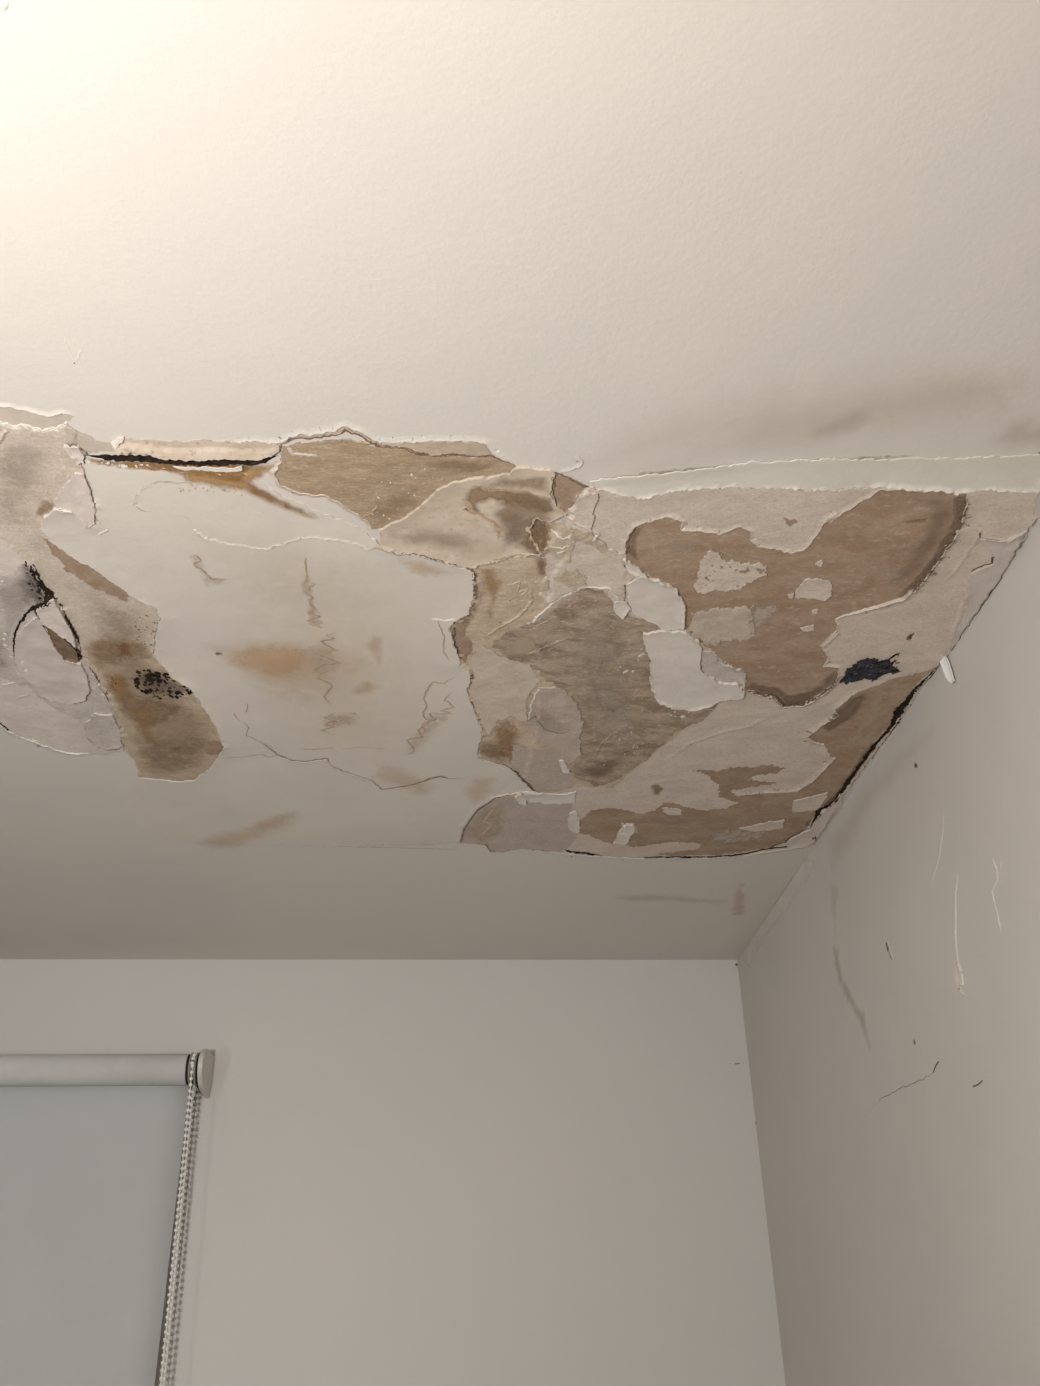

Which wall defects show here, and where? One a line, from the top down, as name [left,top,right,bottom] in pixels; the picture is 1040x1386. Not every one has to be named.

crack [63,420,520,512]
crack [186,517,396,556]
crack [12,561,109,702]
mould [107,669,192,700]
water stain [249,558,359,735]
peeling [0,401,1040,859]
mould [839,633,914,685]
crack [0,722,127,757]